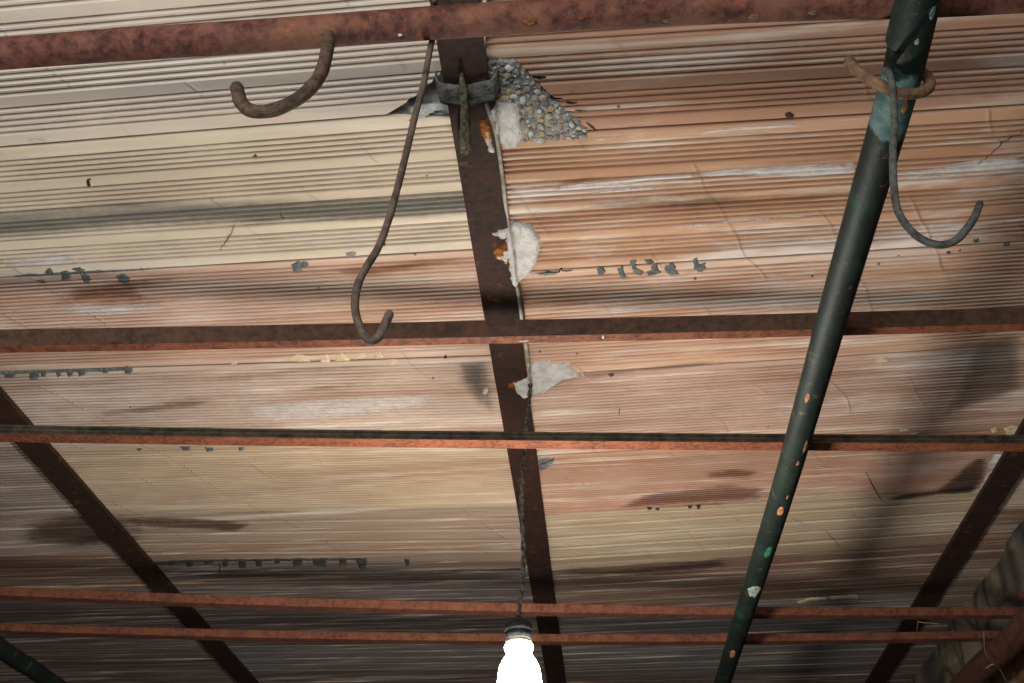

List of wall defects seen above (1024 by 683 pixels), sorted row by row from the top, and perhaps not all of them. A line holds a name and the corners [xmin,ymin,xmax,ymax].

spalling [487,57,588,144]
peeling [492,230,509,264]
peeling [513,376,528,398]
leakage [120,519,244,530]